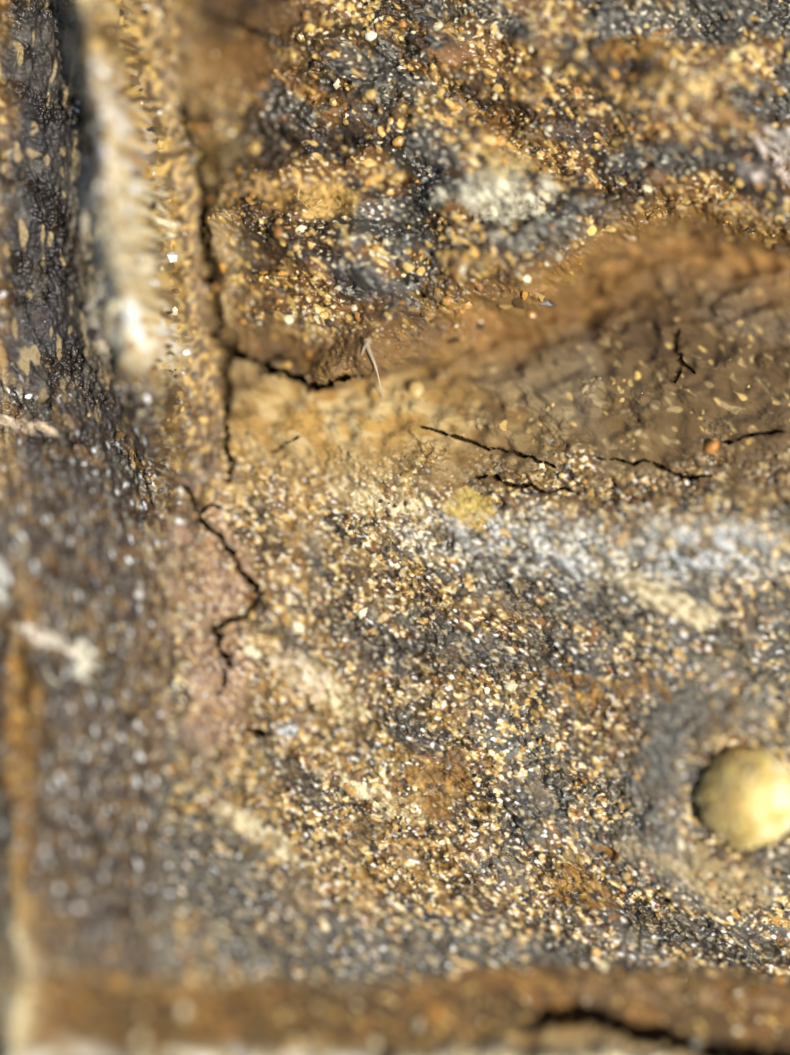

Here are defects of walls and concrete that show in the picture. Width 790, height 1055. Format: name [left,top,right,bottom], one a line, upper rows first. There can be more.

crack [181,97,364,696]